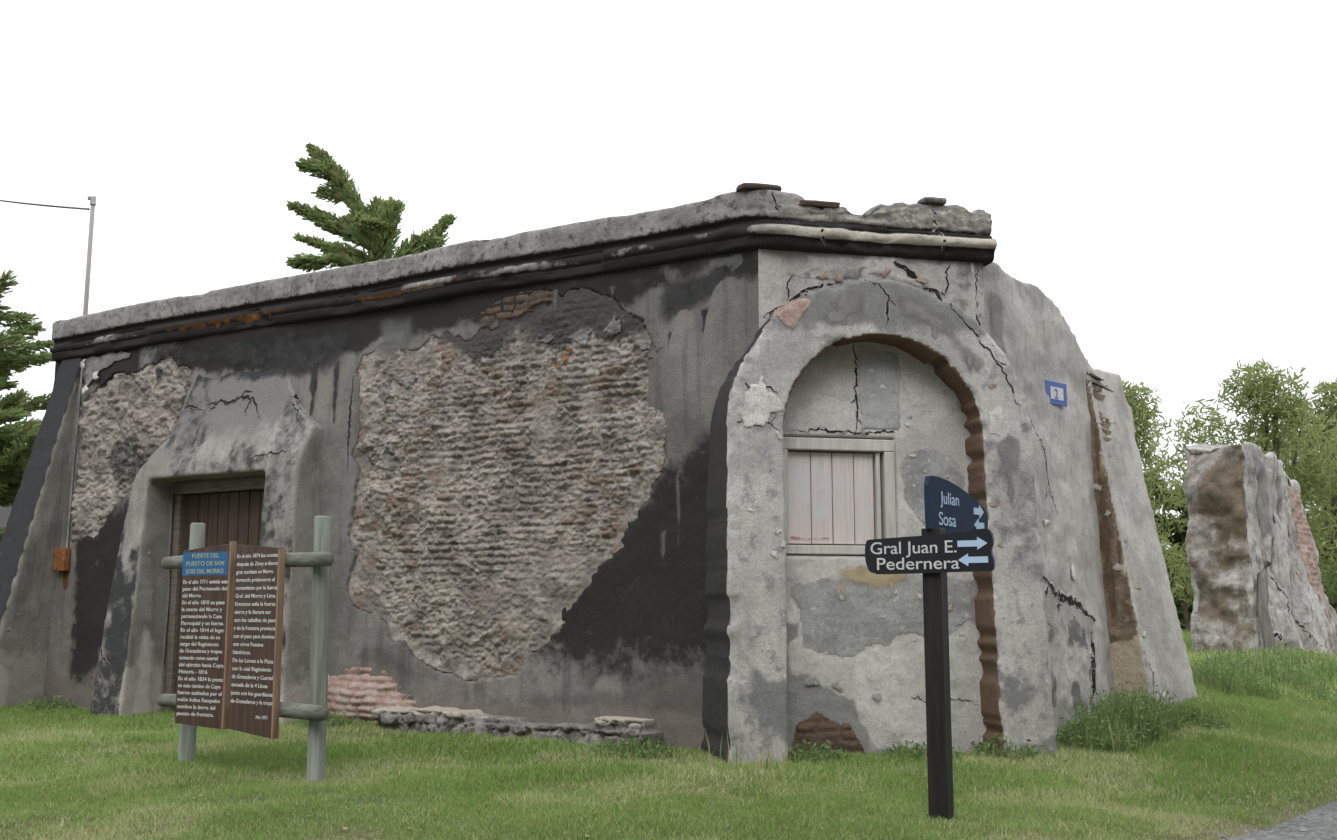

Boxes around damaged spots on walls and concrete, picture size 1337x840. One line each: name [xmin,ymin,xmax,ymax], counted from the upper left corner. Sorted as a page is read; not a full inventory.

spalling [770,298,811,329]
crack [763,210,1058,515]
spalling [70,351,192,543]
crack [181,390,261,454]
crack [252,393,302,459]
peeling [740,376,785,440]
spalling [348,288,668,681]
leakage [841,566,906,595]
peeling [131,628,154,715]
spalling [327,667,416,723]
spalling [792,711,865,755]